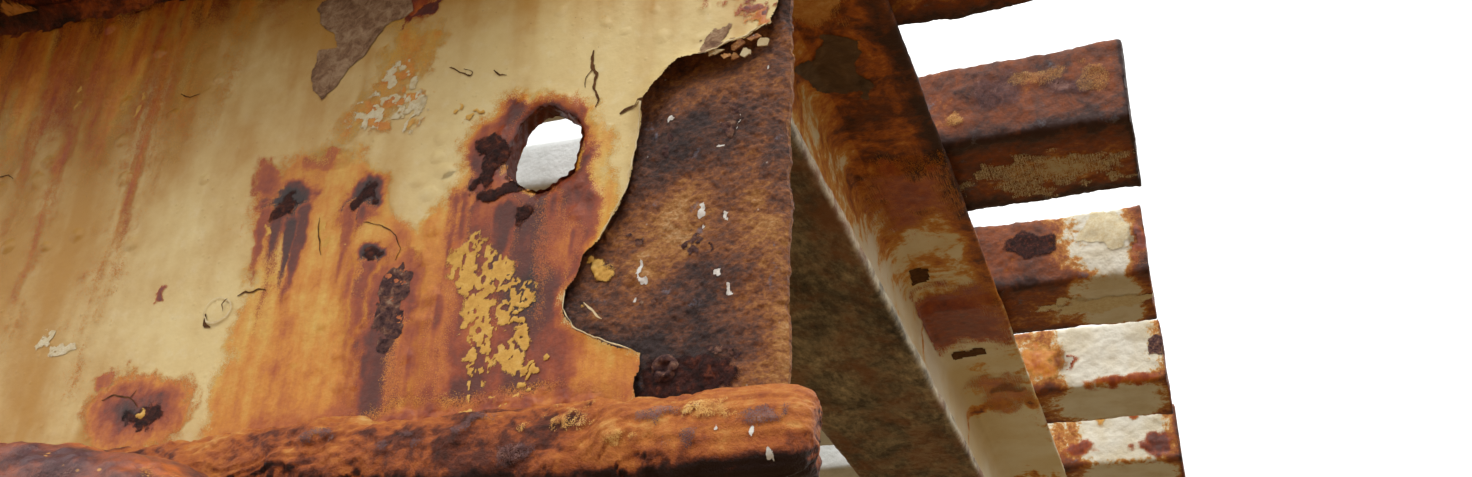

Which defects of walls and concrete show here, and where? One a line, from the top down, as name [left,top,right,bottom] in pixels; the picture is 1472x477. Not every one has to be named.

peeling [311,0,442,100]
peeling [344,59,430,135]
rust [76,0,640,450]
peeling [445,230,550,412]
rust [908,278,1165,418]
rust [1061,419,1105,457]
rust [1127,430,1179,463]